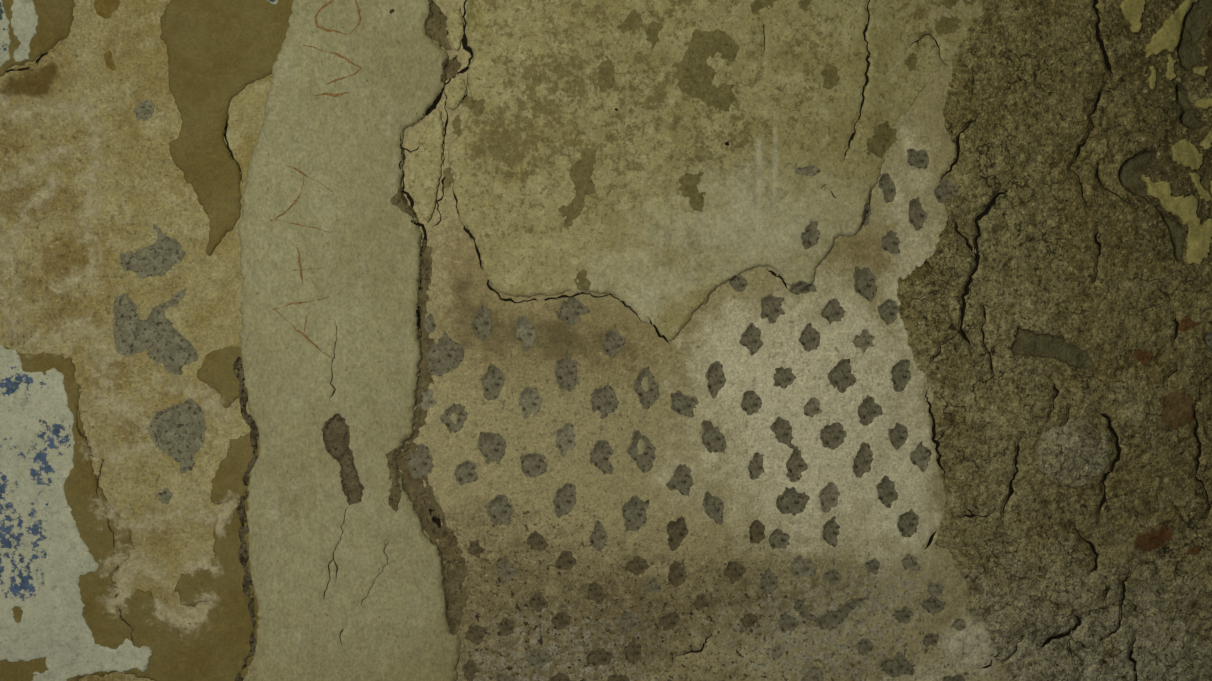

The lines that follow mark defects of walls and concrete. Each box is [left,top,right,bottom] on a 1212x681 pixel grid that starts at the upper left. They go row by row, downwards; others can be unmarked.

peeling [0,0,38,67]
spalling [424,0,461,82]
peeling [671,29,738,113]
crack [940,103,978,182]
crack [1070,0,1135,285]
crack [922,190,1008,474]
spalling [897,0,1212,681]
peeling [0,343,153,681]
spalling [321,413,364,505]
crack [924,439,1022,550]
crack [982,381,1166,681]
crack [1194,403,1211,513]